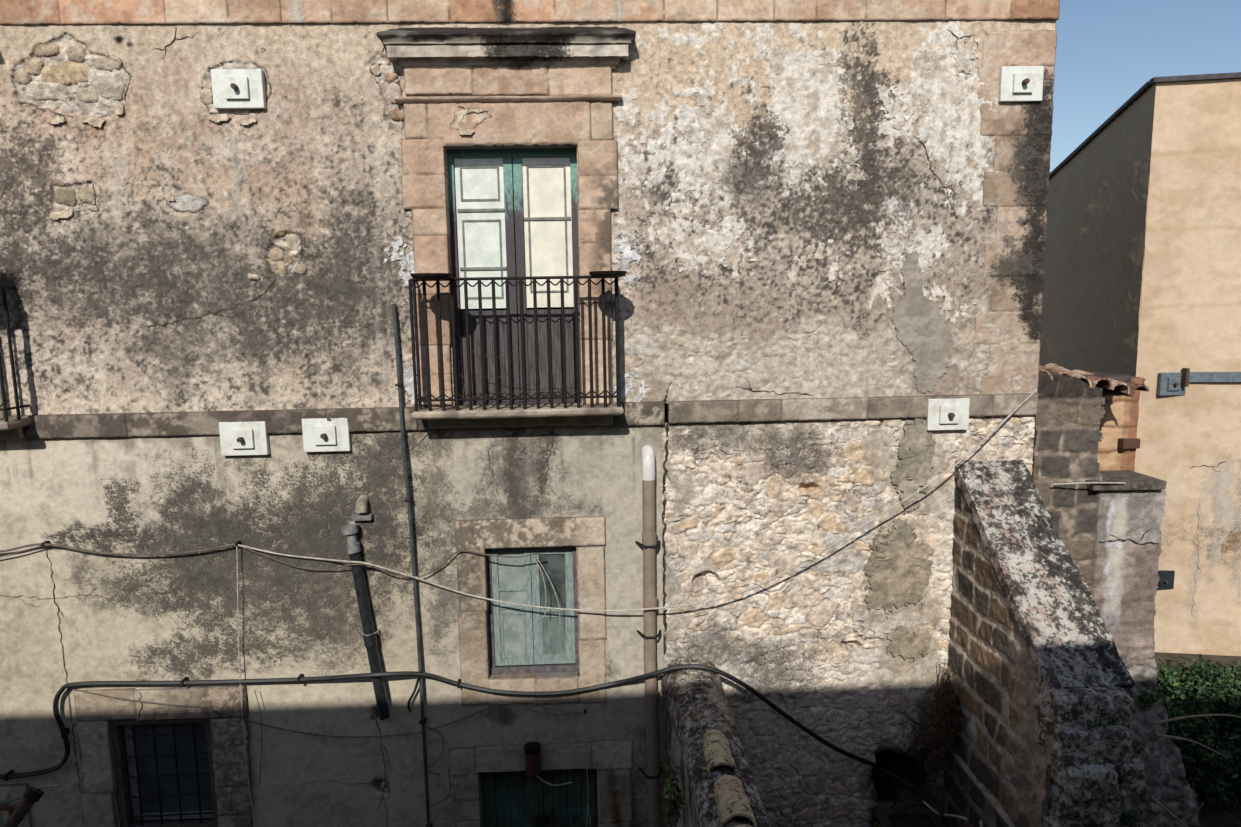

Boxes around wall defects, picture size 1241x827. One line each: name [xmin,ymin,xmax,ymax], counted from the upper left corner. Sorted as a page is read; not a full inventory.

spalling [10,32,132,128]
water stain [477,0,575,69]
spalling [49,181,98,220]
water stain [0,131,408,403]
spalling [247,229,307,280]
water stain [721,110,789,201]
water stain [779,40,921,249]
water stain [988,69,1054,341]
water stain [41,429,601,688]
crack [1099,529,1159,545]
crack [1,548,117,822]
crack [302,719,390,826]